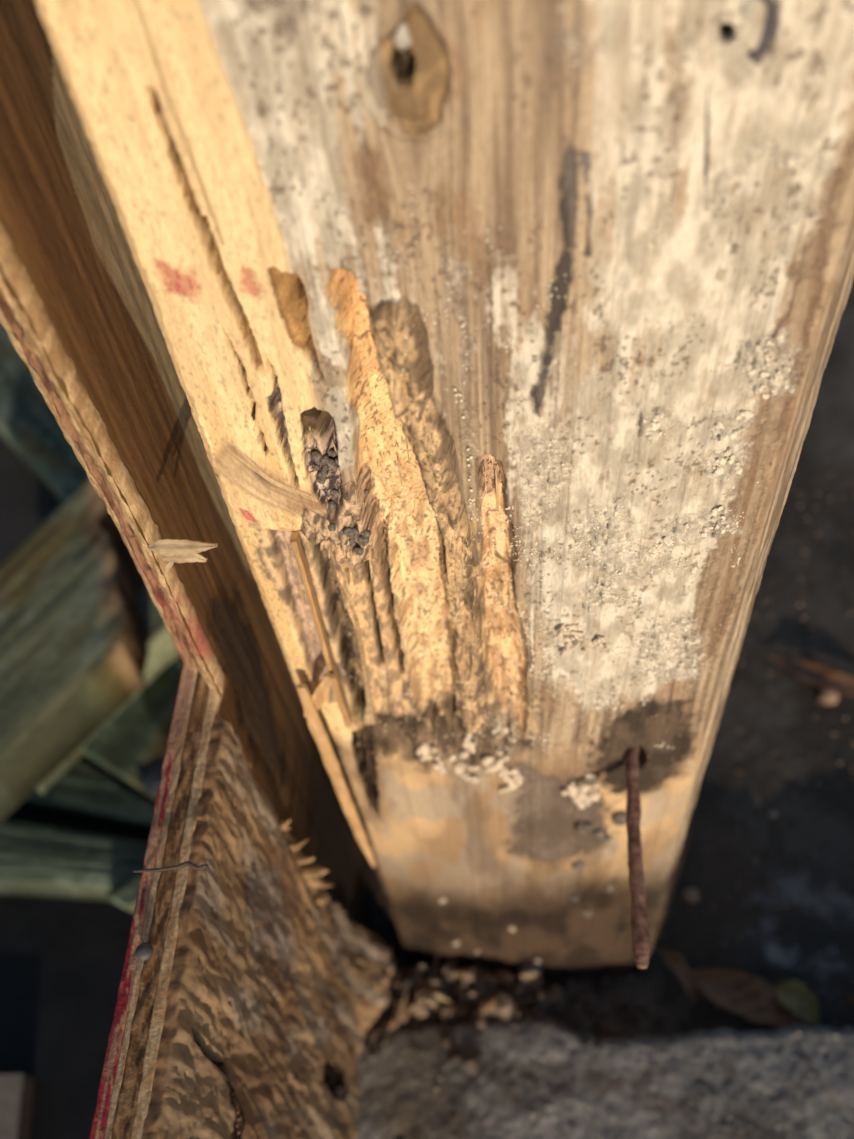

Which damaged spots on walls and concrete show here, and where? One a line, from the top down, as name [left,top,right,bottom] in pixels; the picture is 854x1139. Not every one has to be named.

crack [154,92,267,454]
peeling [446,258,479,492]
water stain [506,762,613,862]
water stain [387,850,683,979]
crack [192,1029,245,1139]